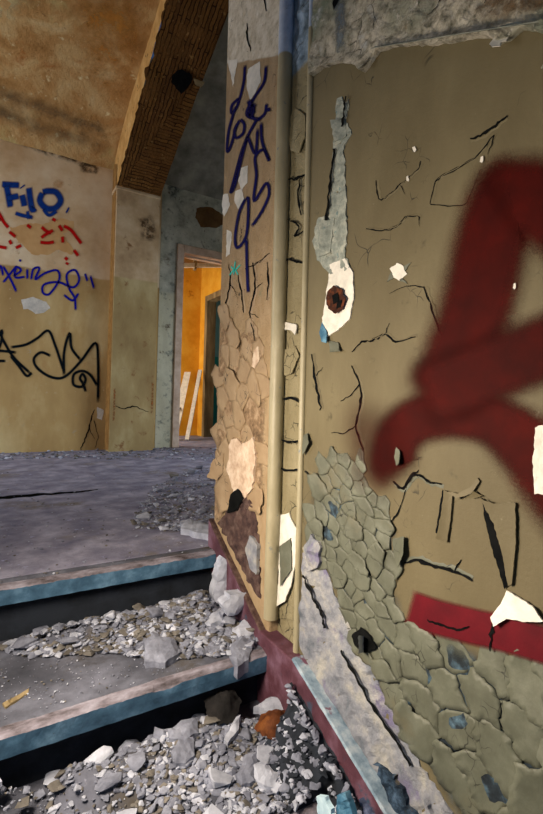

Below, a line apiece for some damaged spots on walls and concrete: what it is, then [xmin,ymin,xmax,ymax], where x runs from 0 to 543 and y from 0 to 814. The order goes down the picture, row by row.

flaking render [307,0,543,77]
flaking render [195,166,248,257]
flaking render [312,96,352,274]
crack [366,115,508,231]
crack [389,285,438,322]
crack [0,489,98,499]
peeling [207,303,270,599]
crack [281,324,418,495]
crack [390,470,444,522]
peeling [532,425,543,495]
crack [404,555,474,581]
peeling [277,446,543,814]